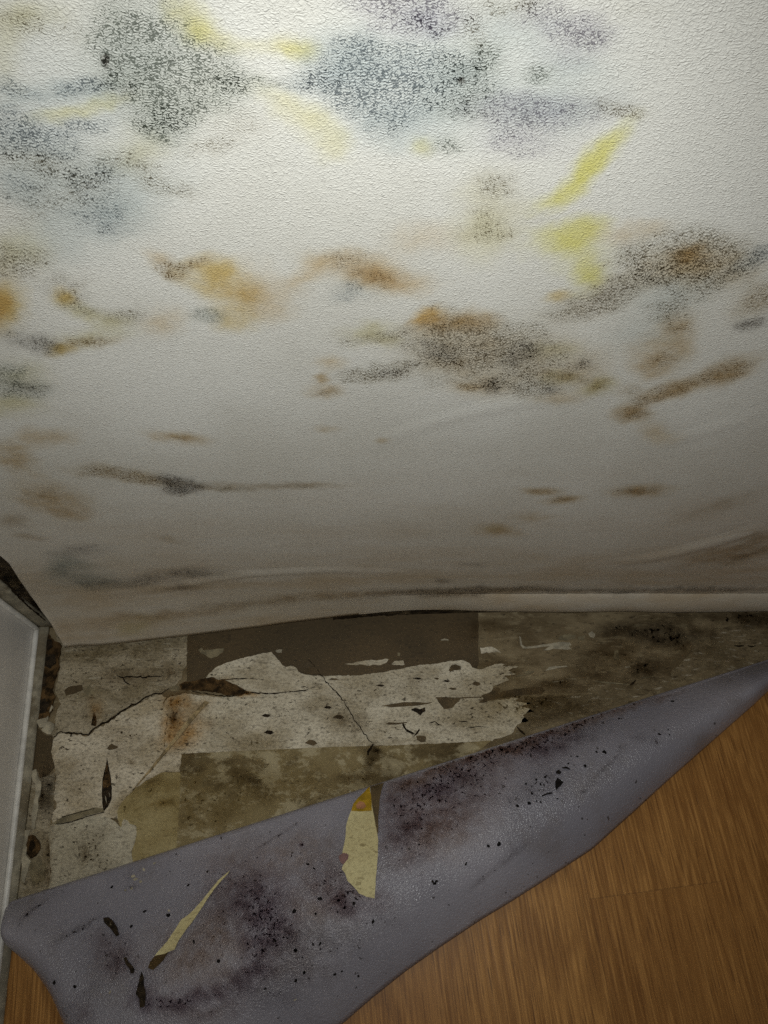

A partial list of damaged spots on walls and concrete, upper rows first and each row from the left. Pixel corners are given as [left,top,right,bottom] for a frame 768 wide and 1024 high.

damp [88,11,260,142]
damp [444,45,492,115]
damp [33,158,114,199]
damp [158,258,205,281]
damp [549,227,752,333]
damp [339,305,587,395]
damp [82,465,204,496]
peeling [199,648,224,658]
peeling [37,705,55,735]
crack [53,660,375,755]
peeling [384,664,545,742]